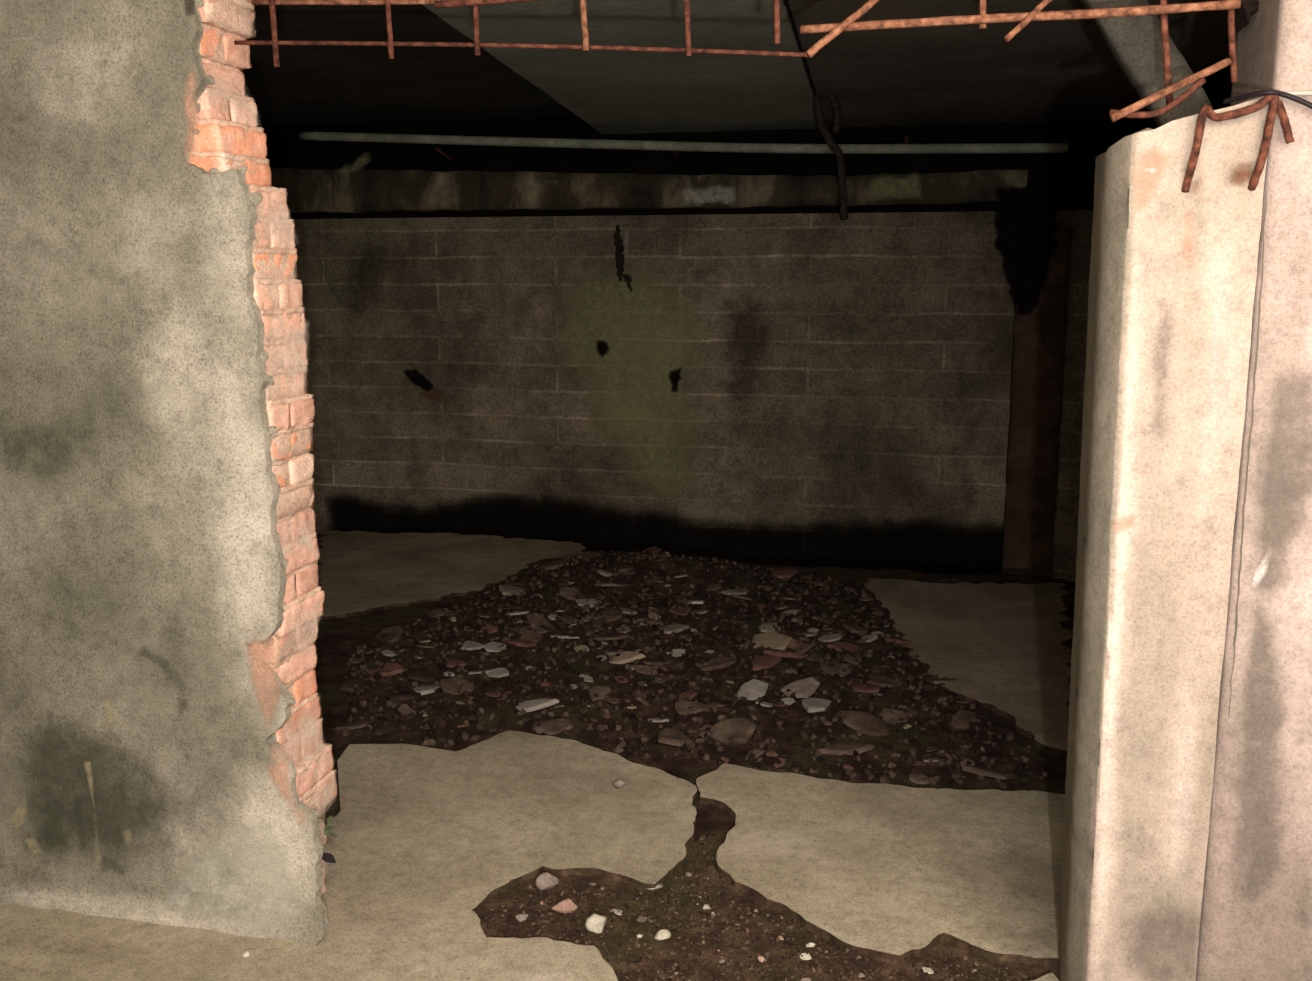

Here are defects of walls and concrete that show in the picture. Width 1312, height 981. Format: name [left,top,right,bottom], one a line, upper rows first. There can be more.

spalling [1181,95,1295,193]
corrosion [1232,166,1251,183]
flaking render [186,0,1259,895]